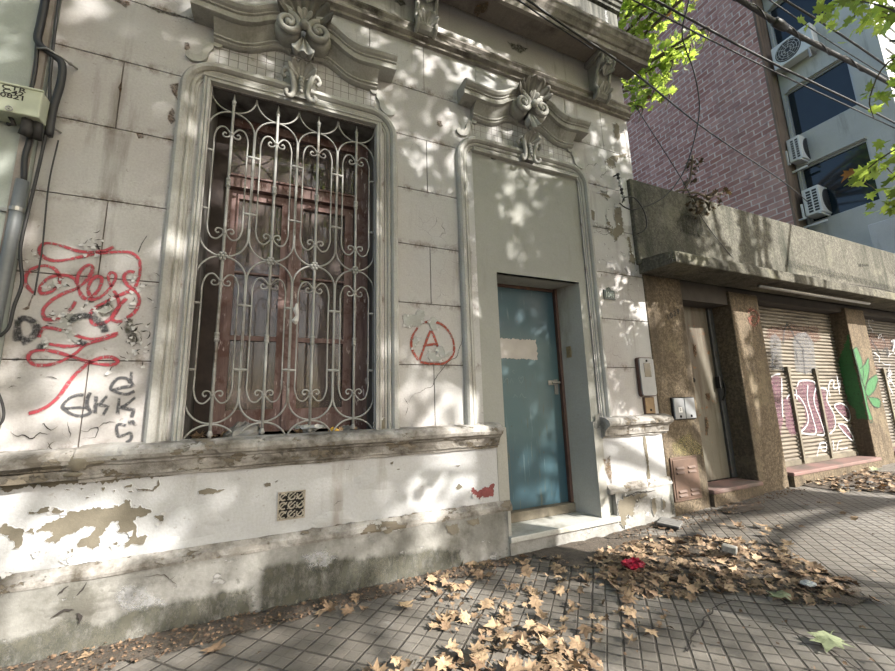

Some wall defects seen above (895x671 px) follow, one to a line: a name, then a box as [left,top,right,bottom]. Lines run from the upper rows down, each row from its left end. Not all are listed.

peeling [78,230,104,257]
peeling [591,153,639,298]
peeling [40,277,70,290]
peeling [41,294,116,348]
peeling [117,273,157,368]
peeling [0,455,166,567]
peeling [197,487,226,496]
peeling [455,483,495,501]
flaking render [617,490,666,528]
damp [261,549,462,612]
damp [0,588,250,667]